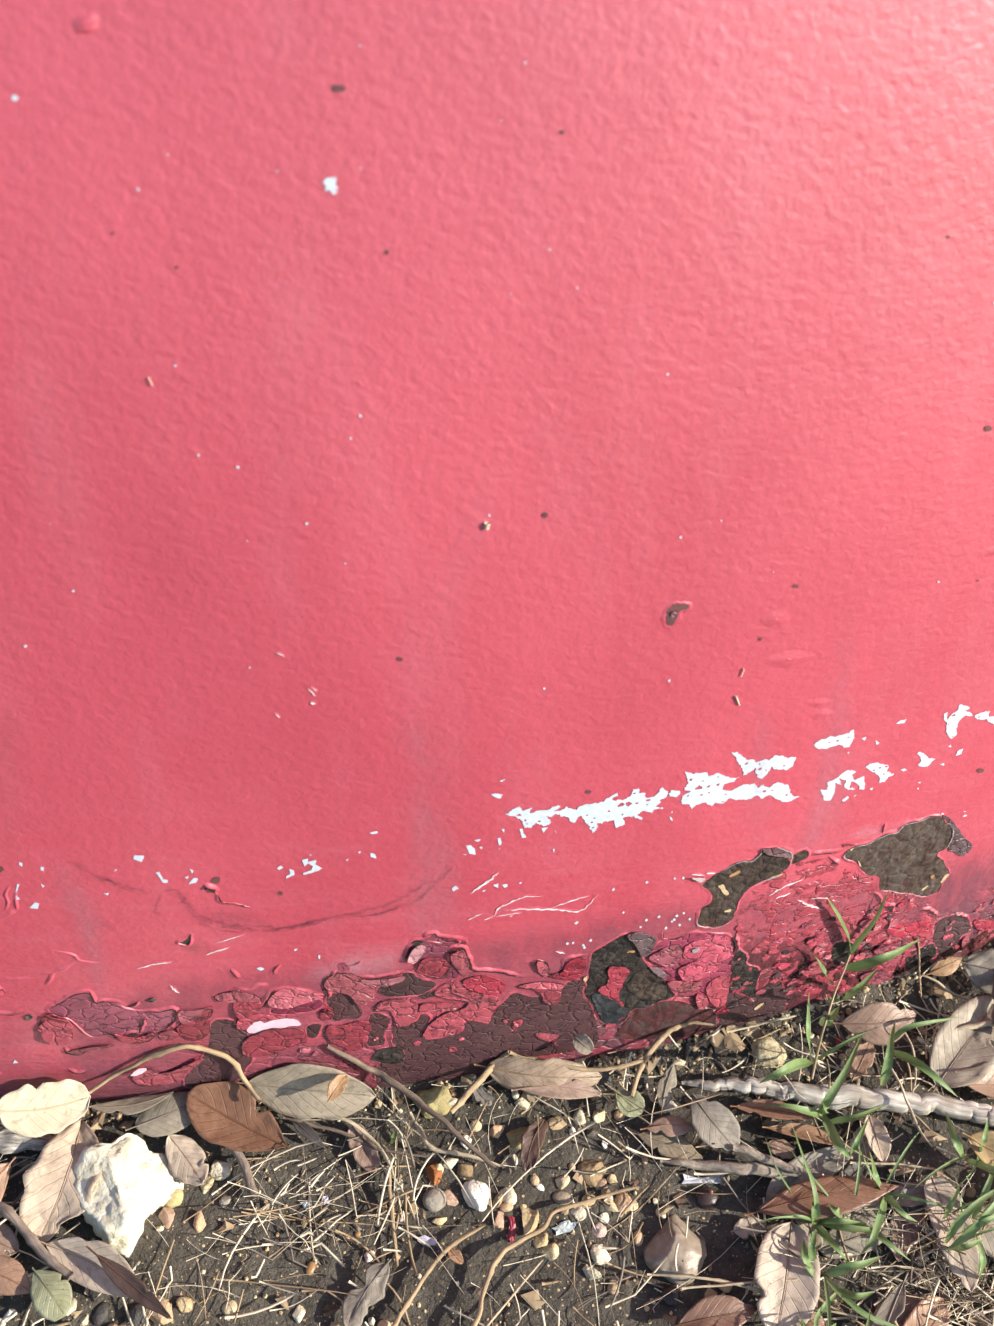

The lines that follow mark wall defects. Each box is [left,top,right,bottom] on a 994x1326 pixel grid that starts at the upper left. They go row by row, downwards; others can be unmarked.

peeling [660,601,693,630]
peeling [463,752,799,855]
peeling [813,704,994,802]
peeling [25,859,994,1089]